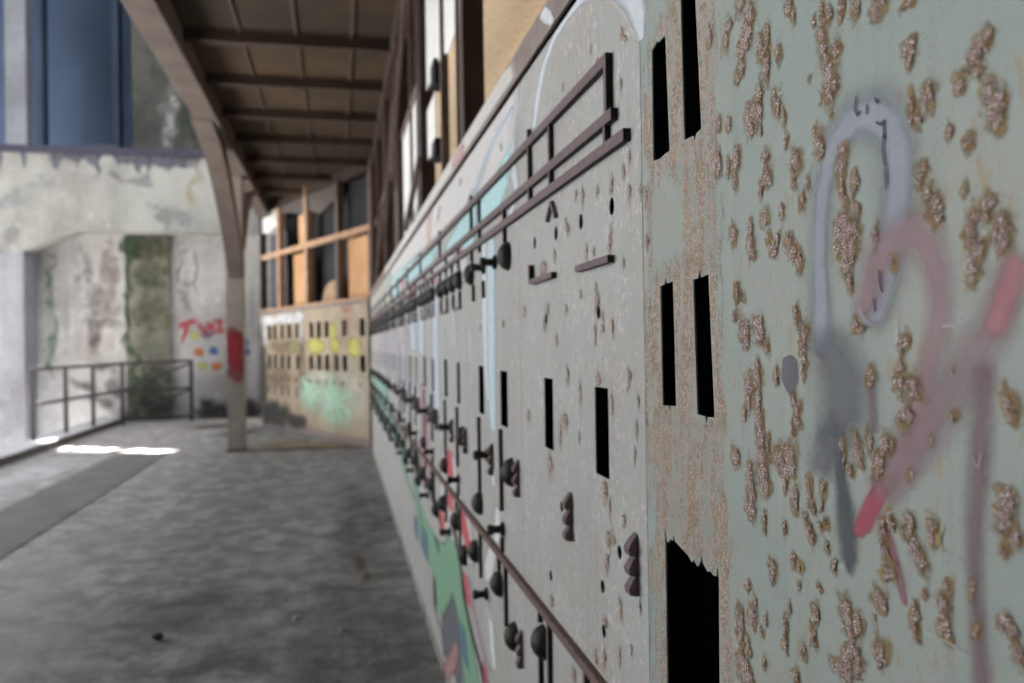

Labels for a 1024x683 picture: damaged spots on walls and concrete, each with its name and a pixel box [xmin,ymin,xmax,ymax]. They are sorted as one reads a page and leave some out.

damp [50,95,200,187]
damp [131,235,166,326]
corrosion [575,0,878,683]